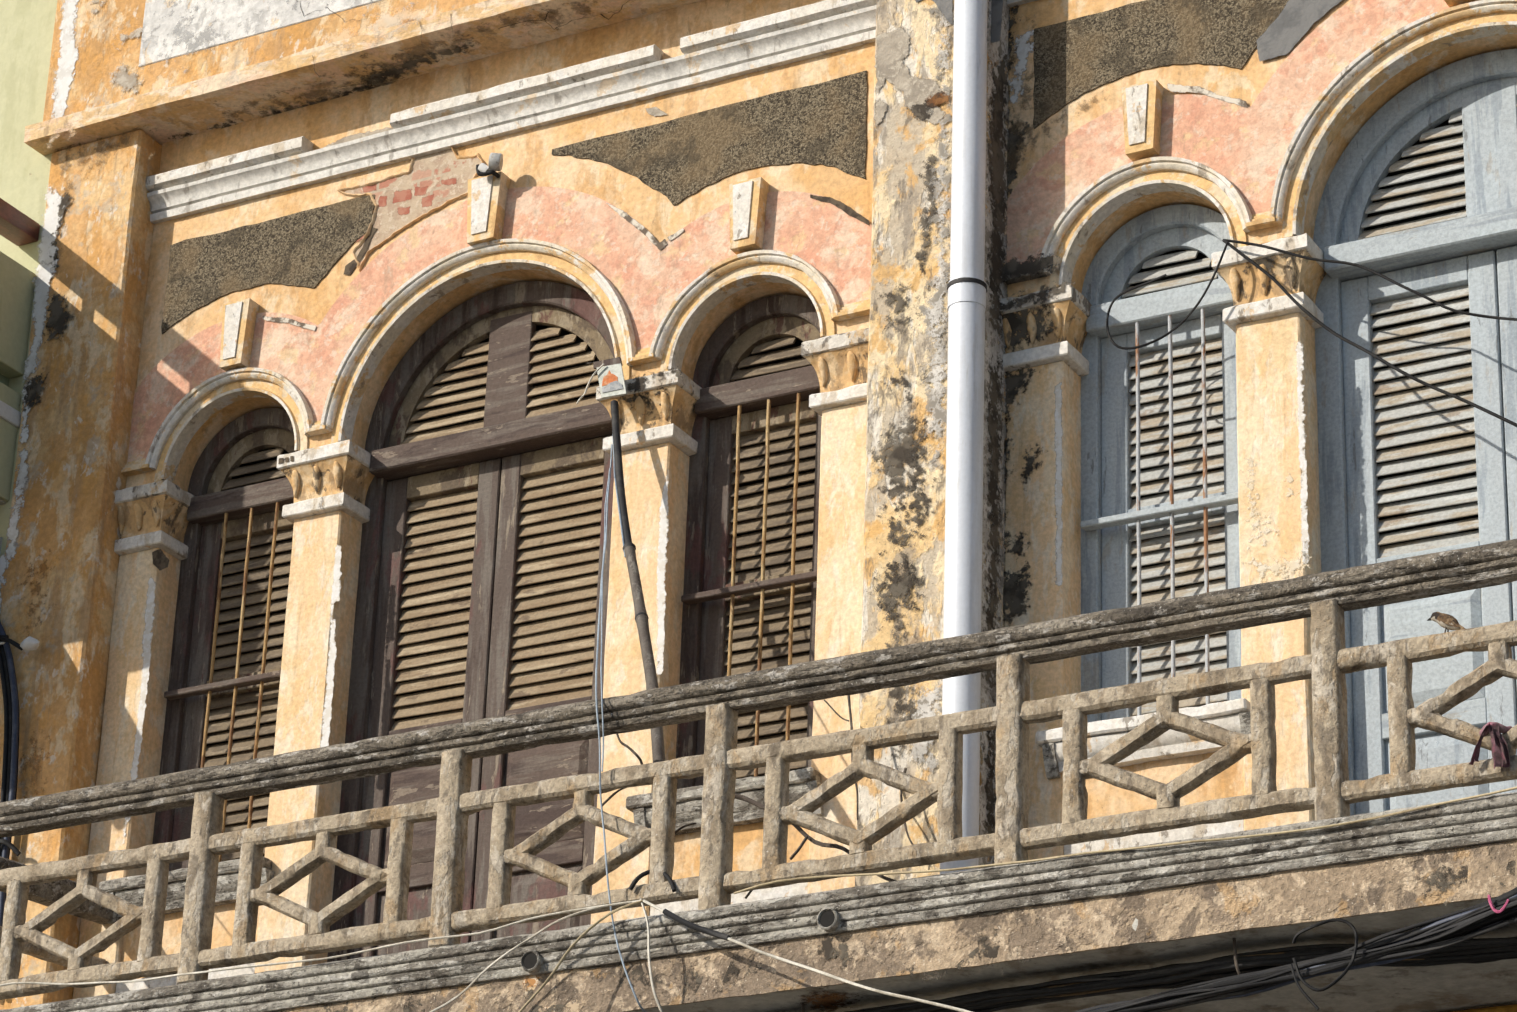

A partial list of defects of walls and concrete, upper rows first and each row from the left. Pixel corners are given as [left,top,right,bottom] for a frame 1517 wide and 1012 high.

flaking render [646,107,667,116]
flaking render [1167,83,1248,108]
flaking render [337,146,485,275]
flaking render [262,316,316,331]
leakage [865,6,954,648]
leakage [878,679,942,723]
leakage [885,740,940,772]